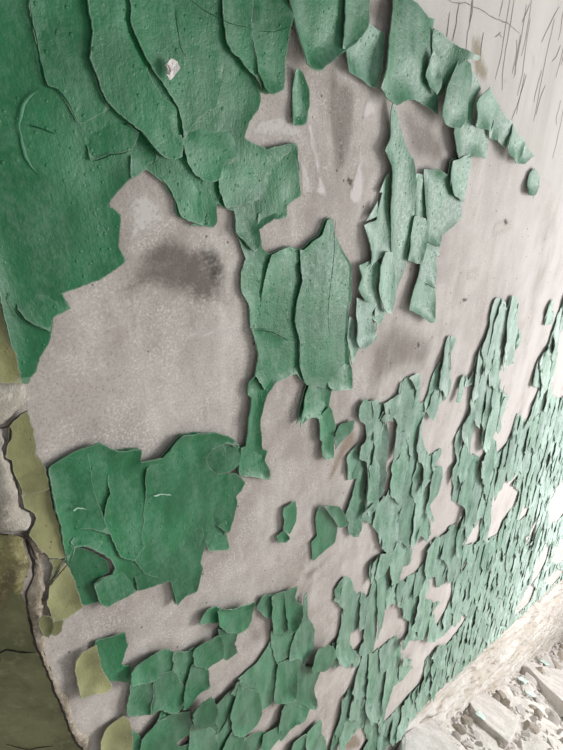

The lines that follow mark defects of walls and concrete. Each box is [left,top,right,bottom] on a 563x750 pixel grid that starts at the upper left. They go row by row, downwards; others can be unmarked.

leakage [132,196,161,239]
leakage [146,245,223,296]
peeling [0,0,535,480]
peeling [527,168,540,196]
crack [0,410,28,445]
crack [0,532,83,750]
peeling [0,410,245,750]
peeling [74,296,563,750]